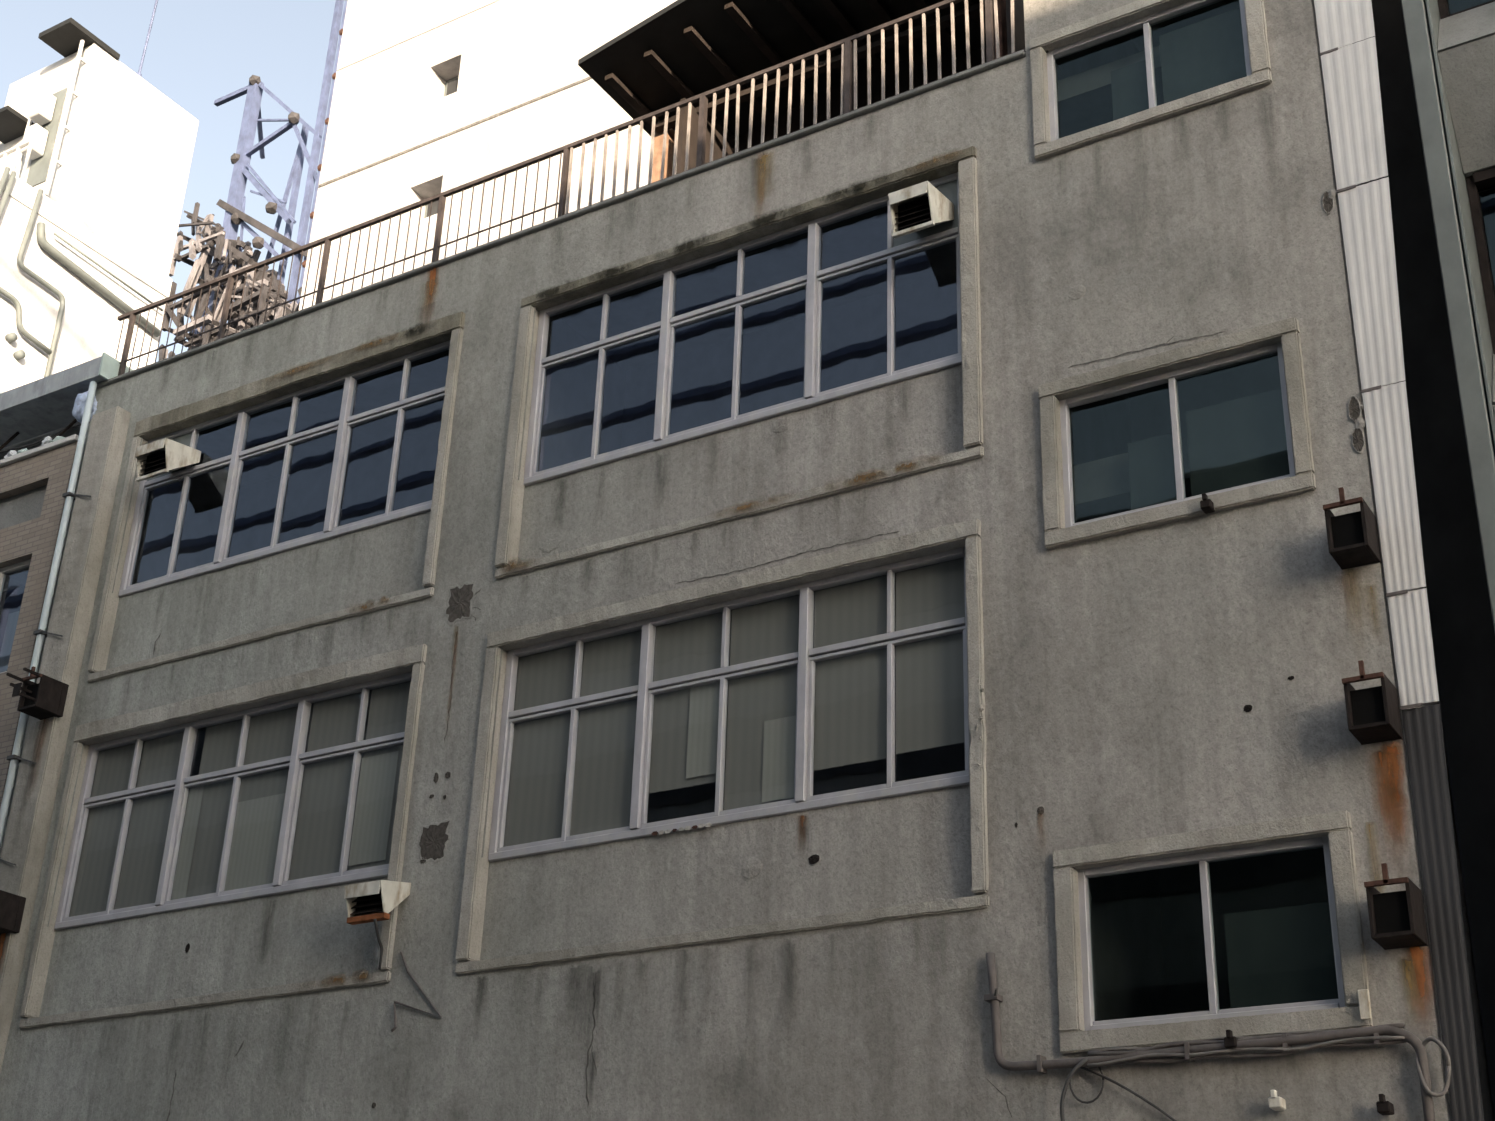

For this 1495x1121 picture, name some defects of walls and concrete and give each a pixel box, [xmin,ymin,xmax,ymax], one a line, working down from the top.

spalling [444,581,476,627]
peeling [429,771,451,800]
rust [1367,743,1403,878]
spalling [418,817,453,864]
rust [1403,946,1428,1003]
crack [585,982,597,1106]